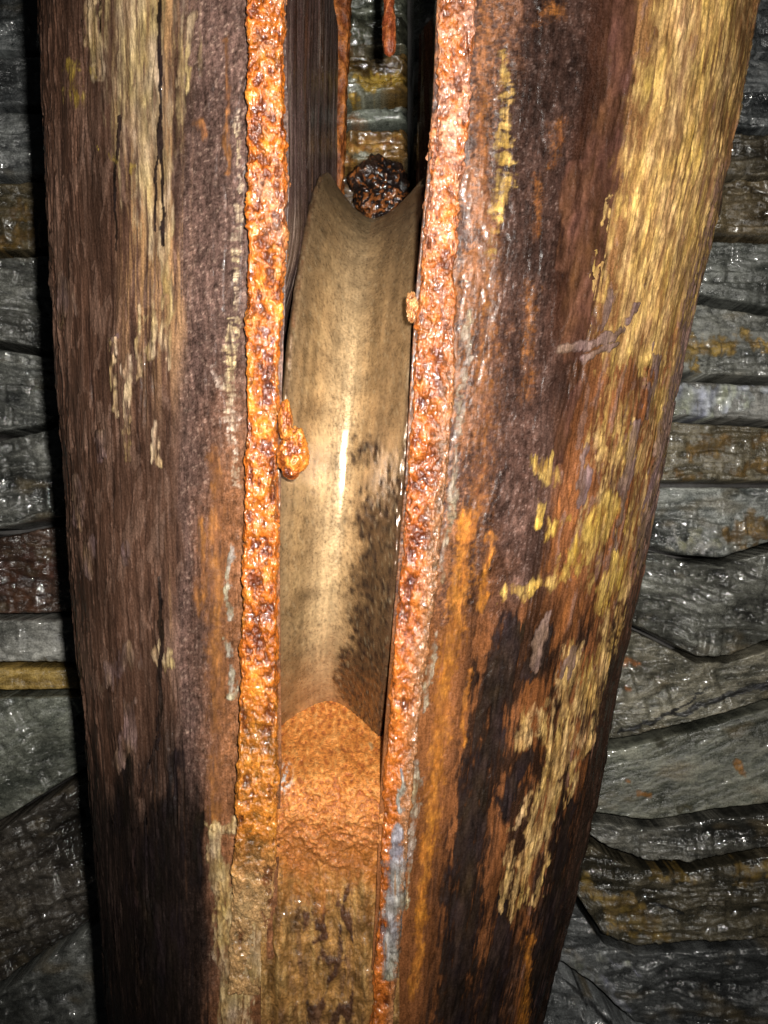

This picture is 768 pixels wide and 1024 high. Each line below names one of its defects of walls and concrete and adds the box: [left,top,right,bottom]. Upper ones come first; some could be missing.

crack [113,115,121,251]
crack [154,0,166,247]
corrosion [409,513,470,990]